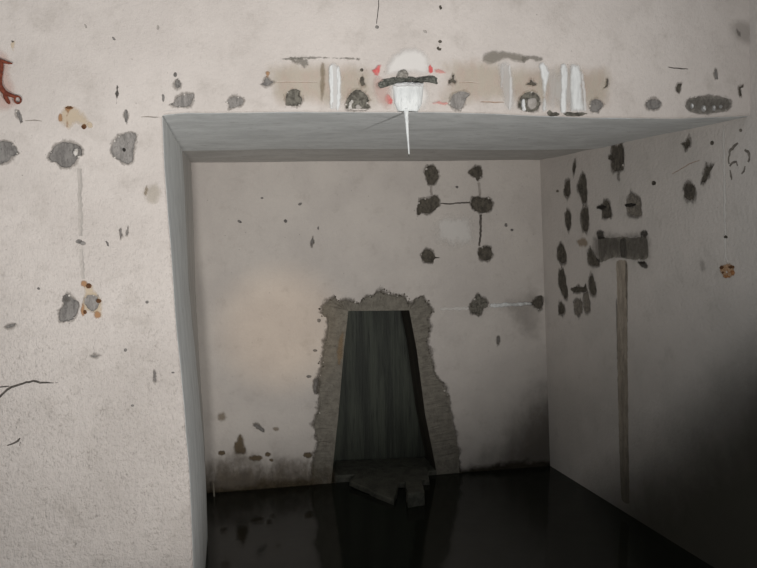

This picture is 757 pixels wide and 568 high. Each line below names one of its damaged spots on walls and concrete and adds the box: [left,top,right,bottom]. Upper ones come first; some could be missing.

spalling [686,94,731,114]
rust [58,106,92,129]
spalling [0,141,22,164]
spalling [48,142,82,168]
spalling [110,132,137,166]
rust [719,264,735,278]
rust [81,281,101,318]
crack [0,380,58,398]
spalling [306,288,460,484]
water stain [234,435,273,462]
water stain [206,466,320,493]